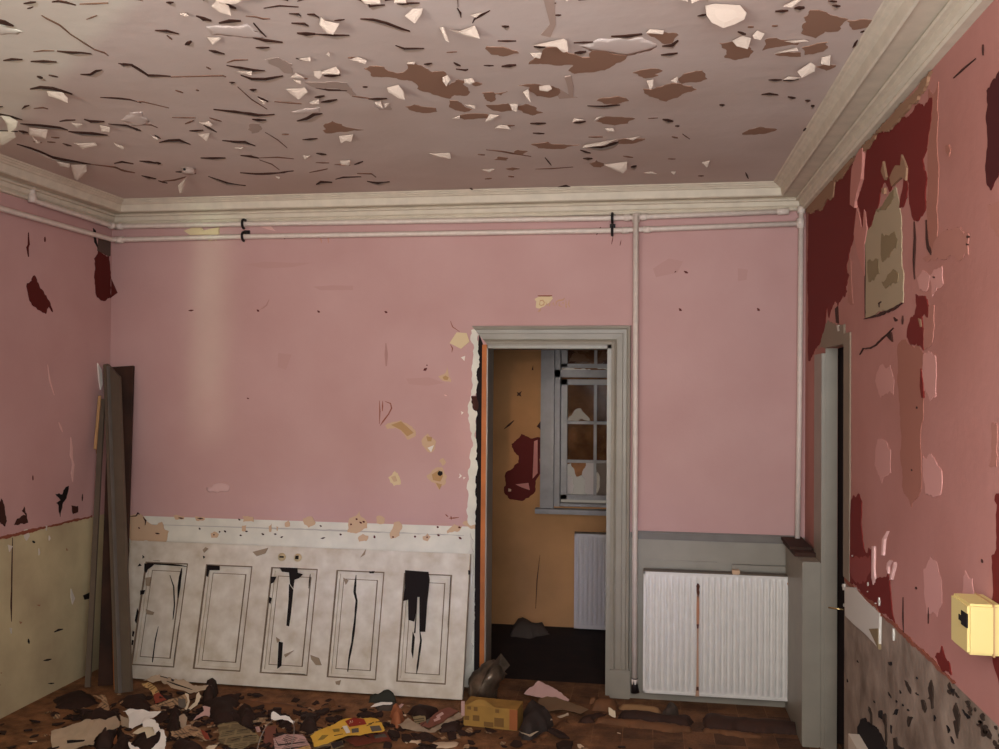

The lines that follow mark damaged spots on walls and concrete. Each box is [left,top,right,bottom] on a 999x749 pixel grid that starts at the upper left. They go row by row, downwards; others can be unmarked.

peeling [440,12,628,74]
peeling [682,0,746,28]
peeling [719,10,872,80]
peeling [350,57,560,129]
peeling [985,72,999,190]
peeling [807,98,933,361]
peeling [94,251,118,301]
peeling [991,493,999,604]
spalling [279,567,303,626]
crack [347,577,358,672]
spalling [403,570,430,674]
peeling [844,572,895,649]